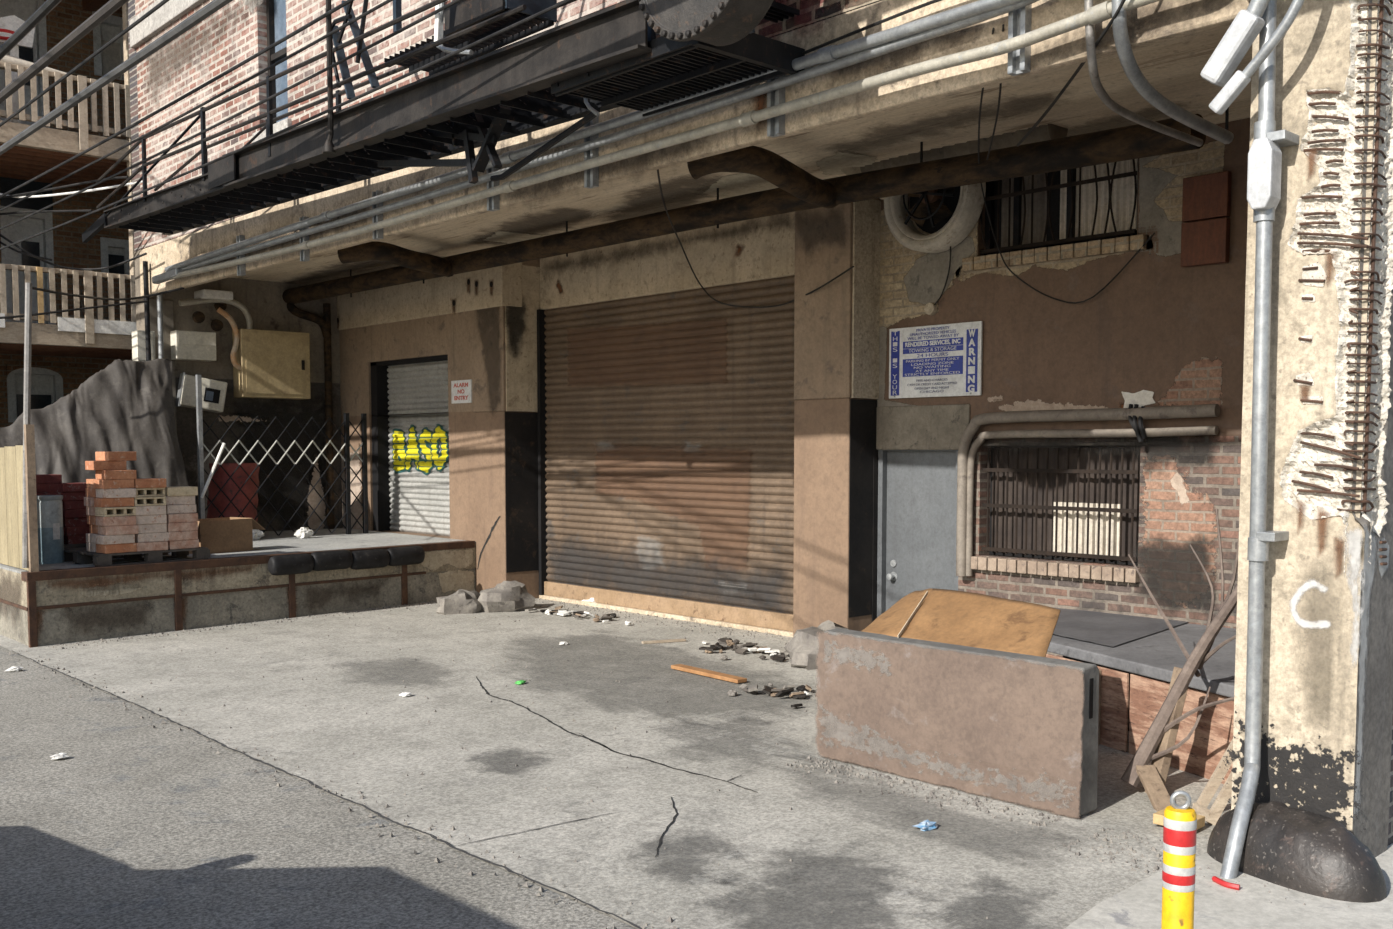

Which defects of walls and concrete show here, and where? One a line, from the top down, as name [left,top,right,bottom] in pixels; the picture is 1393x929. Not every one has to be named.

spalling [1279,0,1393,576]
peeling [1157,356,1223,410]
peeling [1138,456,1219,582]
corrosion [1298,502,1343,574]
crack [12,650,641,929]
crack [476,677,758,857]